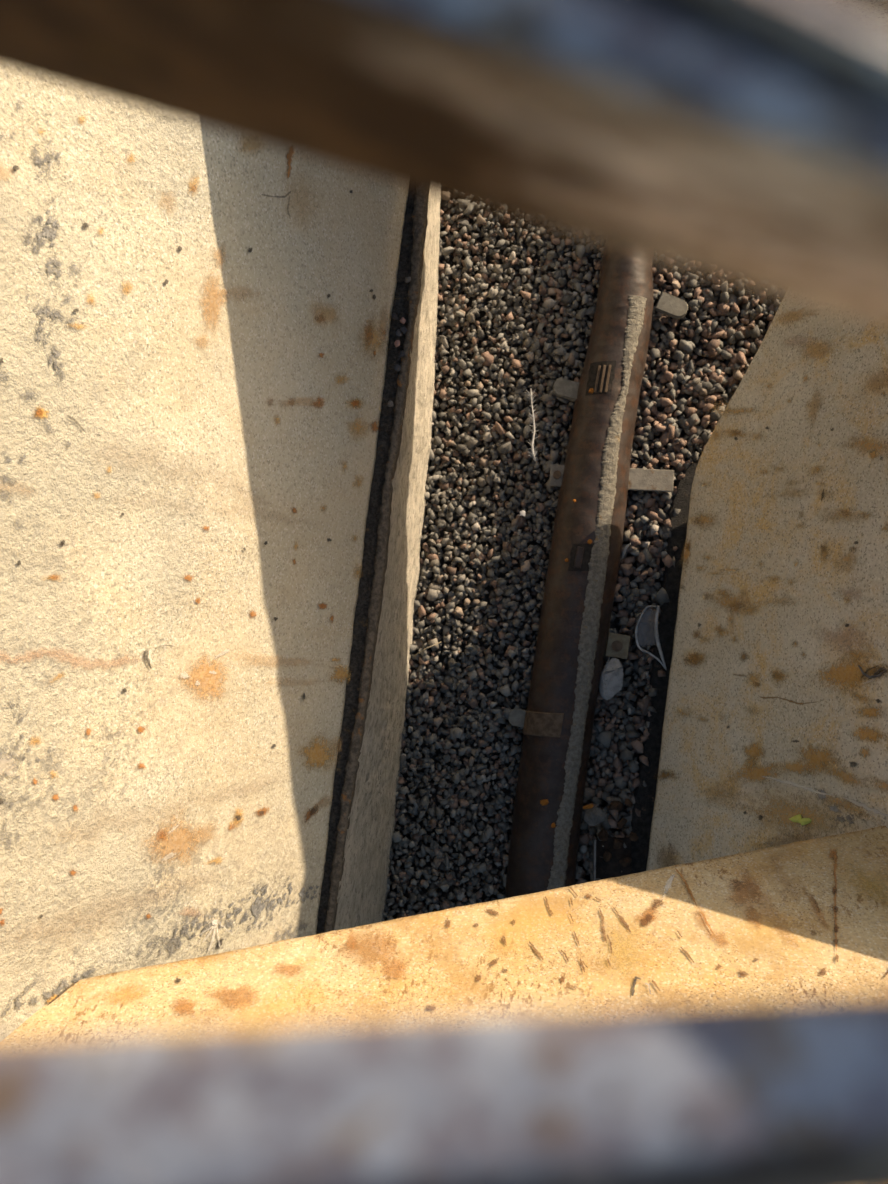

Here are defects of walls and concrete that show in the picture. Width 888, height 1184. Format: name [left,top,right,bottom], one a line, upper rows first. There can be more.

corrosion [180,649,229,701]
corrosion [819,652,886,757]
corrosion [783,745,860,785]
corrosion [147,819,200,862]